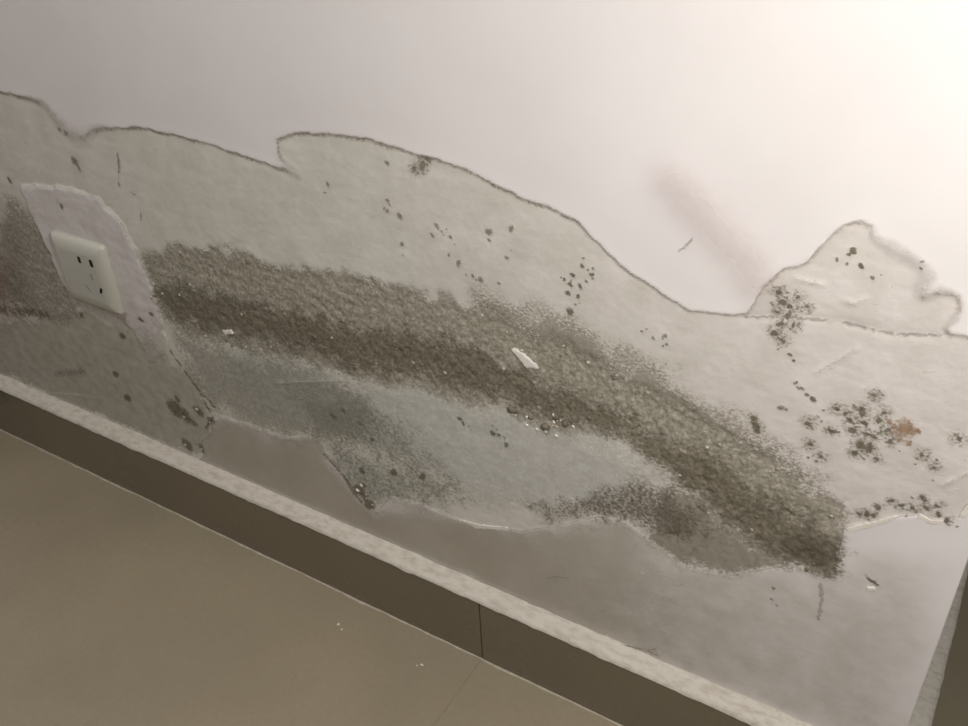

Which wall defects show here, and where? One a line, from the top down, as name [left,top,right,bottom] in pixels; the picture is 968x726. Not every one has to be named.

leakage [0,257,790,639]
peeling [0,92,968,578]
leakage [430,223,901,484]